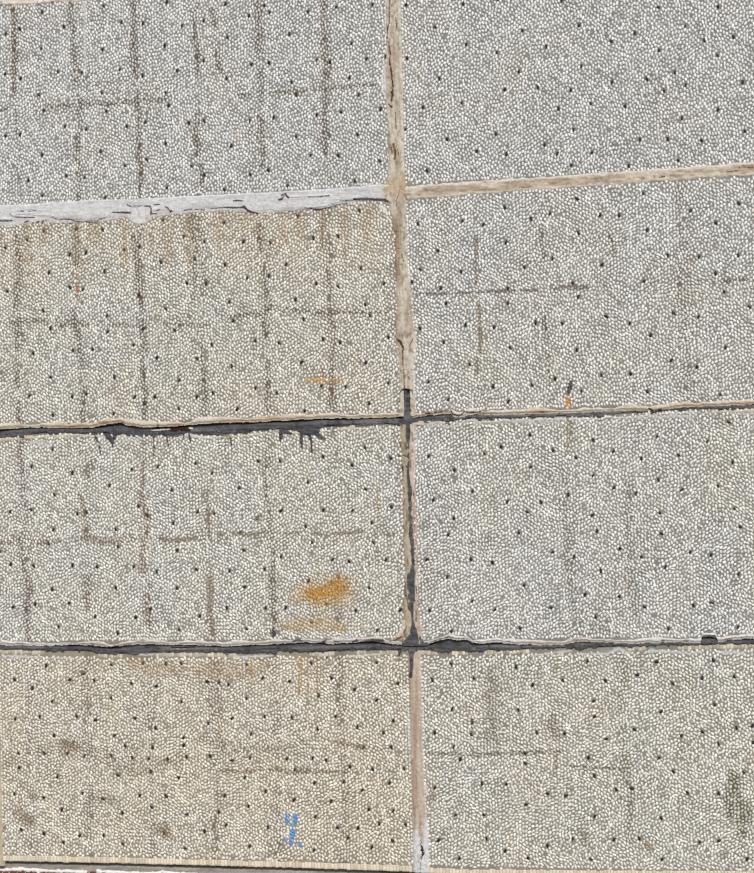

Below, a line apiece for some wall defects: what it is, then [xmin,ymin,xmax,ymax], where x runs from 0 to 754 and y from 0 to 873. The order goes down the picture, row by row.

crack [0,200,258,224]
crack [292,195,357,216]
rust [302,577,344,603]